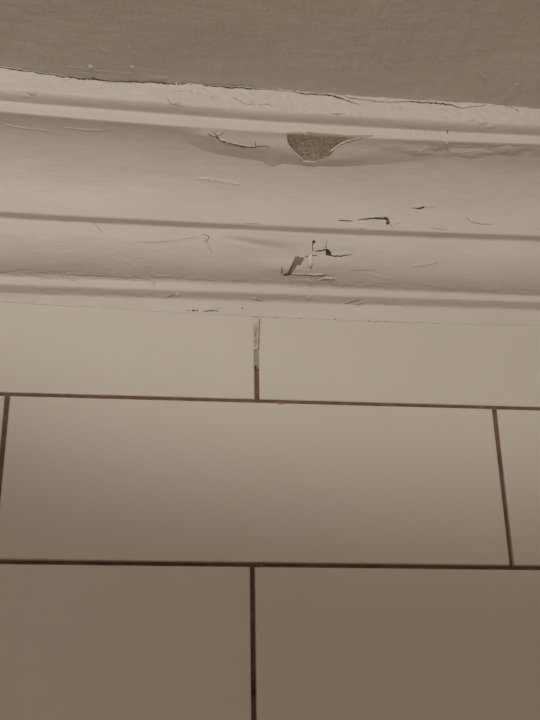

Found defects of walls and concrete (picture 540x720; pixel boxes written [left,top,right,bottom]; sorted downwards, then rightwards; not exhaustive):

crack [0,67,484,108]
crack [208,130,269,148]
peeling [286,132,374,162]
crack [338,216,401,229]
peeling [281,240,353,282]